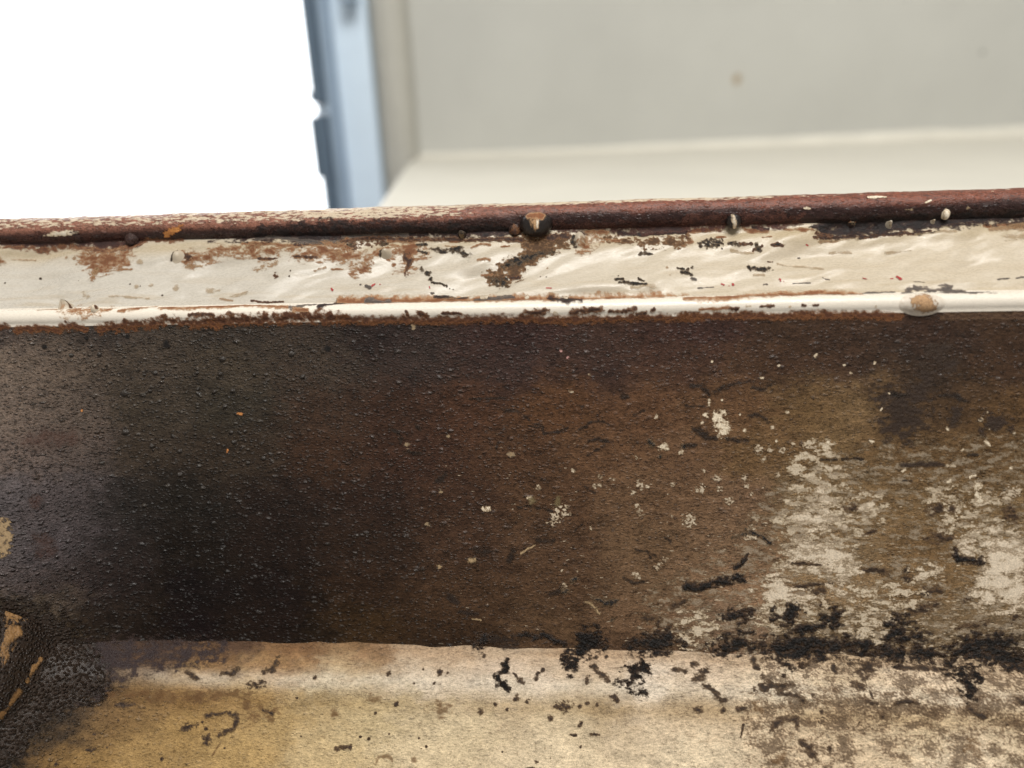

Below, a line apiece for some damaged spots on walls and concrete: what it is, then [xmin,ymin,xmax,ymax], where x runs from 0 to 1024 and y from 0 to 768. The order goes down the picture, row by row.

peeling [43,230,83,242]
rust [544,201,1024,251]
peeling [345,237,470,295]
peeling [481,233,571,289]
peeling [614,275,648,285]
peeling [666,266,714,289]
peeling [683,236,784,272]
rust [0,290,904,335]
rust [940,311,1024,320]
damp [513,667,545,685]
damp [589,663,611,683]
damp [777,691,815,703]